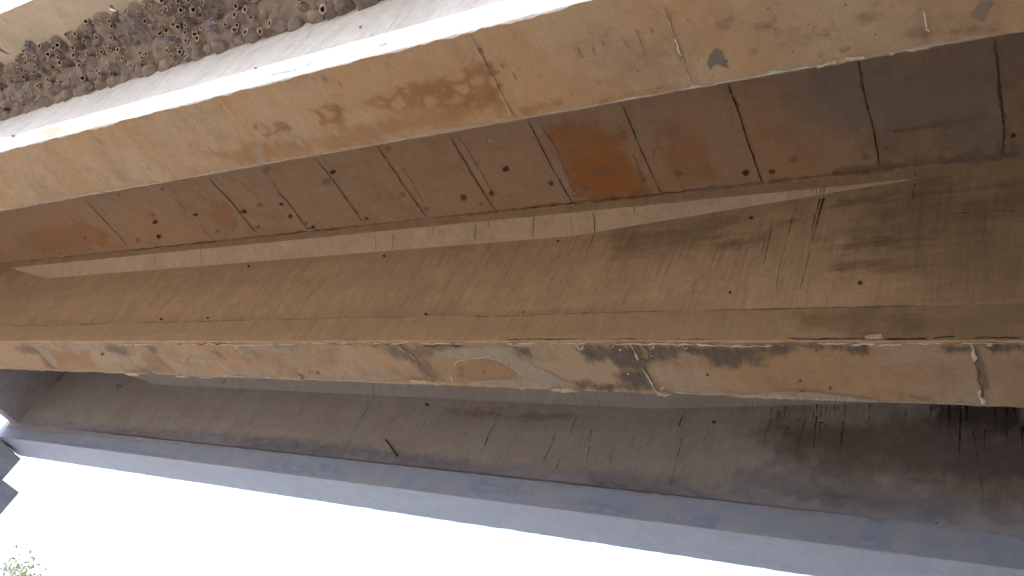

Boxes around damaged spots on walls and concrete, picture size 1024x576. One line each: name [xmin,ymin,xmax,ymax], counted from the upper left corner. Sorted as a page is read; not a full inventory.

crack [616,107,662,193]
crack [728,84,762,182]
crack [858,61,880,169]
leakage [435,344,792,392]
leakage [810,343,868,355]
leakage [0,392,1024,569]